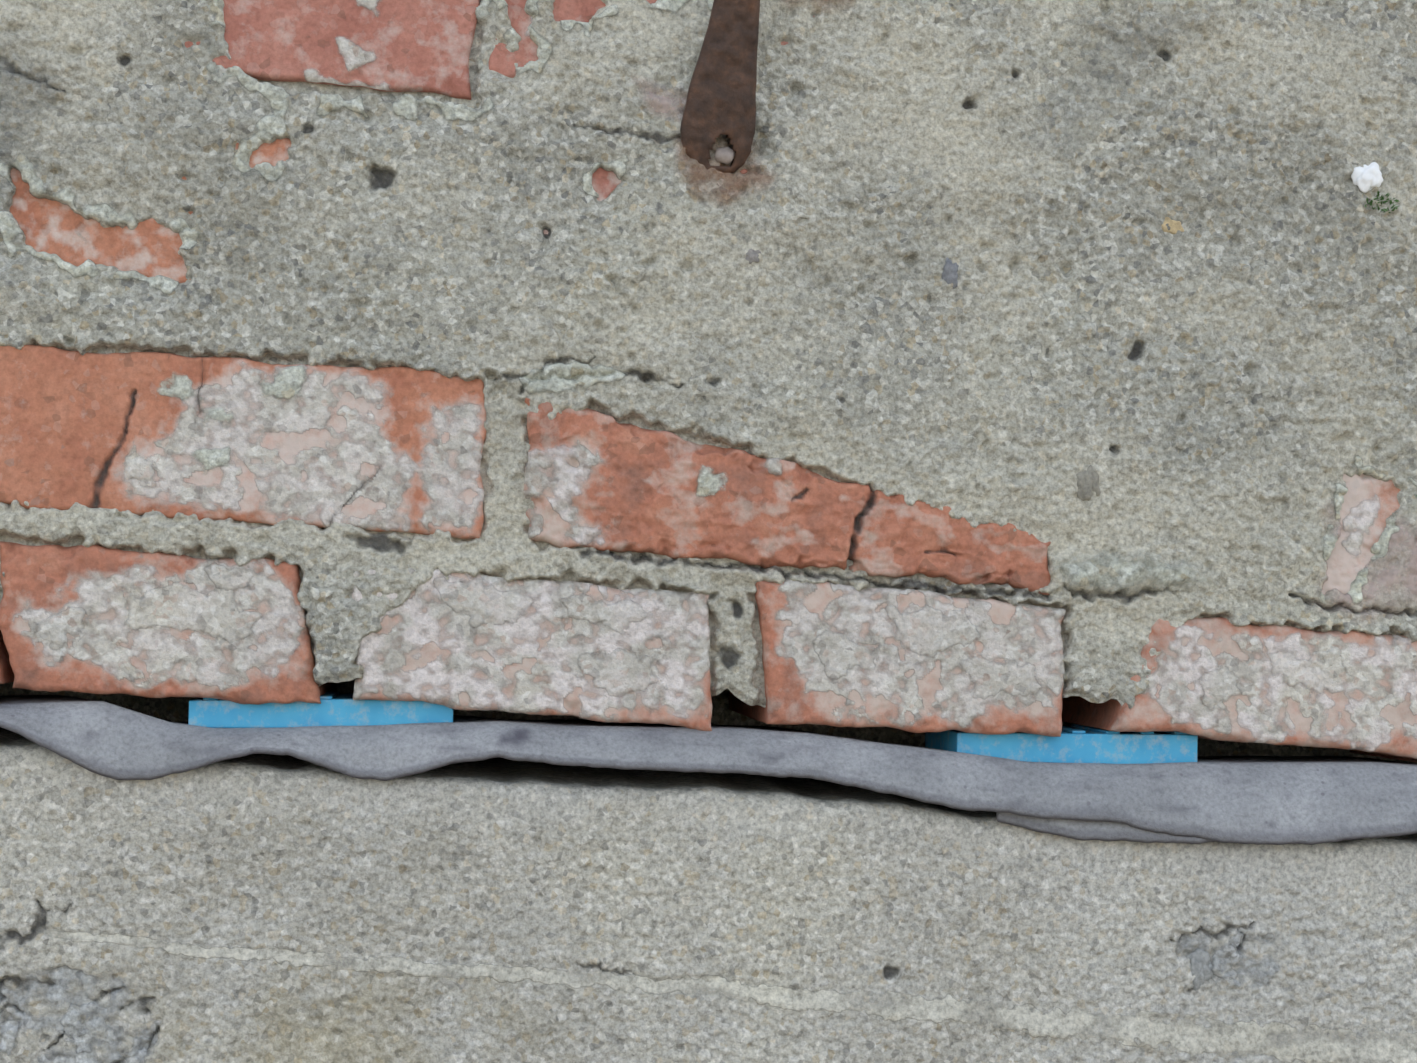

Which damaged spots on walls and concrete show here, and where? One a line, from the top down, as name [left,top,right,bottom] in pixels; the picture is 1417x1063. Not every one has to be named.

flaking render [207,37,493,182]
flaking render [0,155,138,230]
flaking render [0,211,179,294]
crack [93,391,137,508]
peeling [125,362,484,551]
peeling [523,440,604,545]
peeling [696,466,727,496]
flaking render [1323,456,1399,604]
peeling [352,568,739,721]
crack [0,901,69,1006]
spalling [0,966,160,1063]
crack [104,988,159,1044]